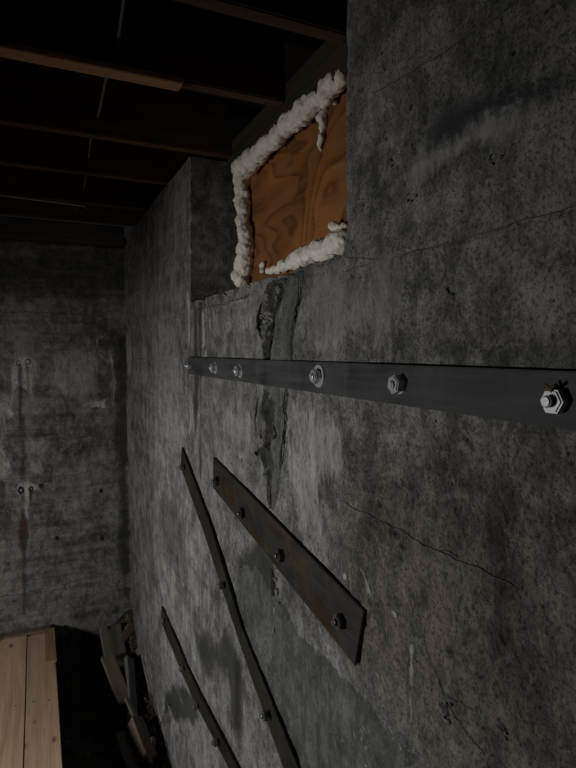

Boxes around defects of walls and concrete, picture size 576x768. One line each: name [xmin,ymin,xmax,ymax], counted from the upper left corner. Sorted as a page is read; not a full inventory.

crack [341,501,526,593]